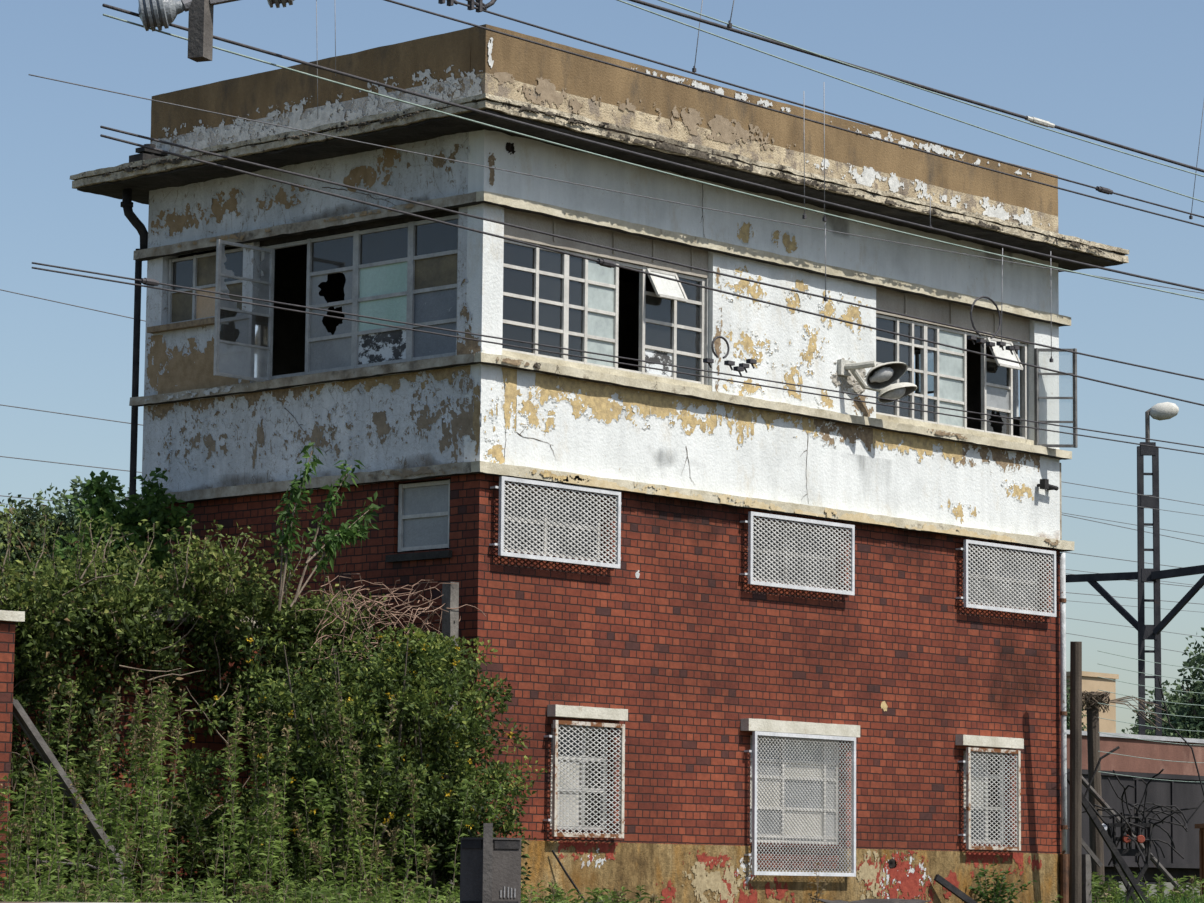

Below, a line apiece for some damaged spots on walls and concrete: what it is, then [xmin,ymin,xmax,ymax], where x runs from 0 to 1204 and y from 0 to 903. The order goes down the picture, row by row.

spalling [276,65,465,141]
peeling [631,67,690,86]
peeling [479,70,865,198]
peeling [856,127,918,148]
flaking render [343,142,470,194]
flaking render [150,182,310,251]
spalling [882,172,1003,231]
peeling [138,265,1040,503]
peeling [519,469,1018,543]
peeling [558,841,618,869]
flaking render [656,850,795,903]
peeling [856,850,1042,903]